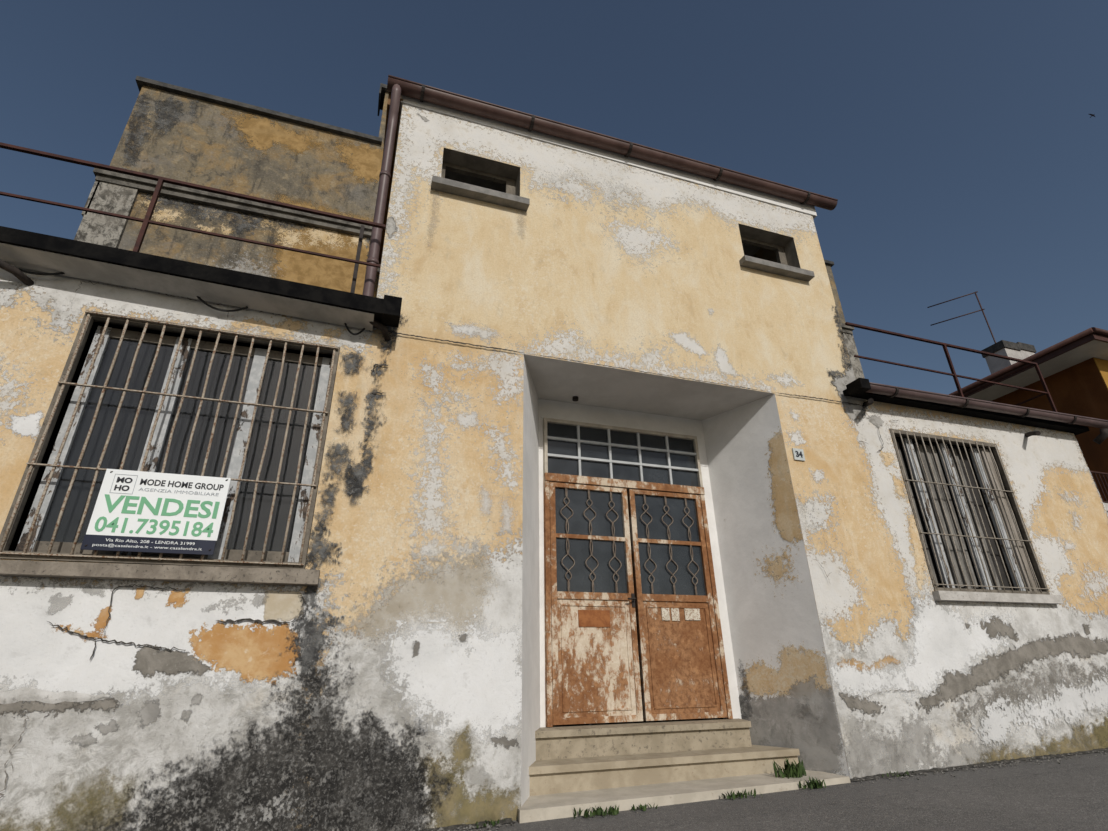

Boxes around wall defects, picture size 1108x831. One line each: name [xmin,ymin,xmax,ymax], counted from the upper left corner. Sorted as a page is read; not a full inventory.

peeling [0,267,380,361]
peeling [331,104,817,298]
leakage [0,316,521,831]
peeling [0,316,811,831]
peeling [740,363,1108,779]
leakage [843,653,1108,779]